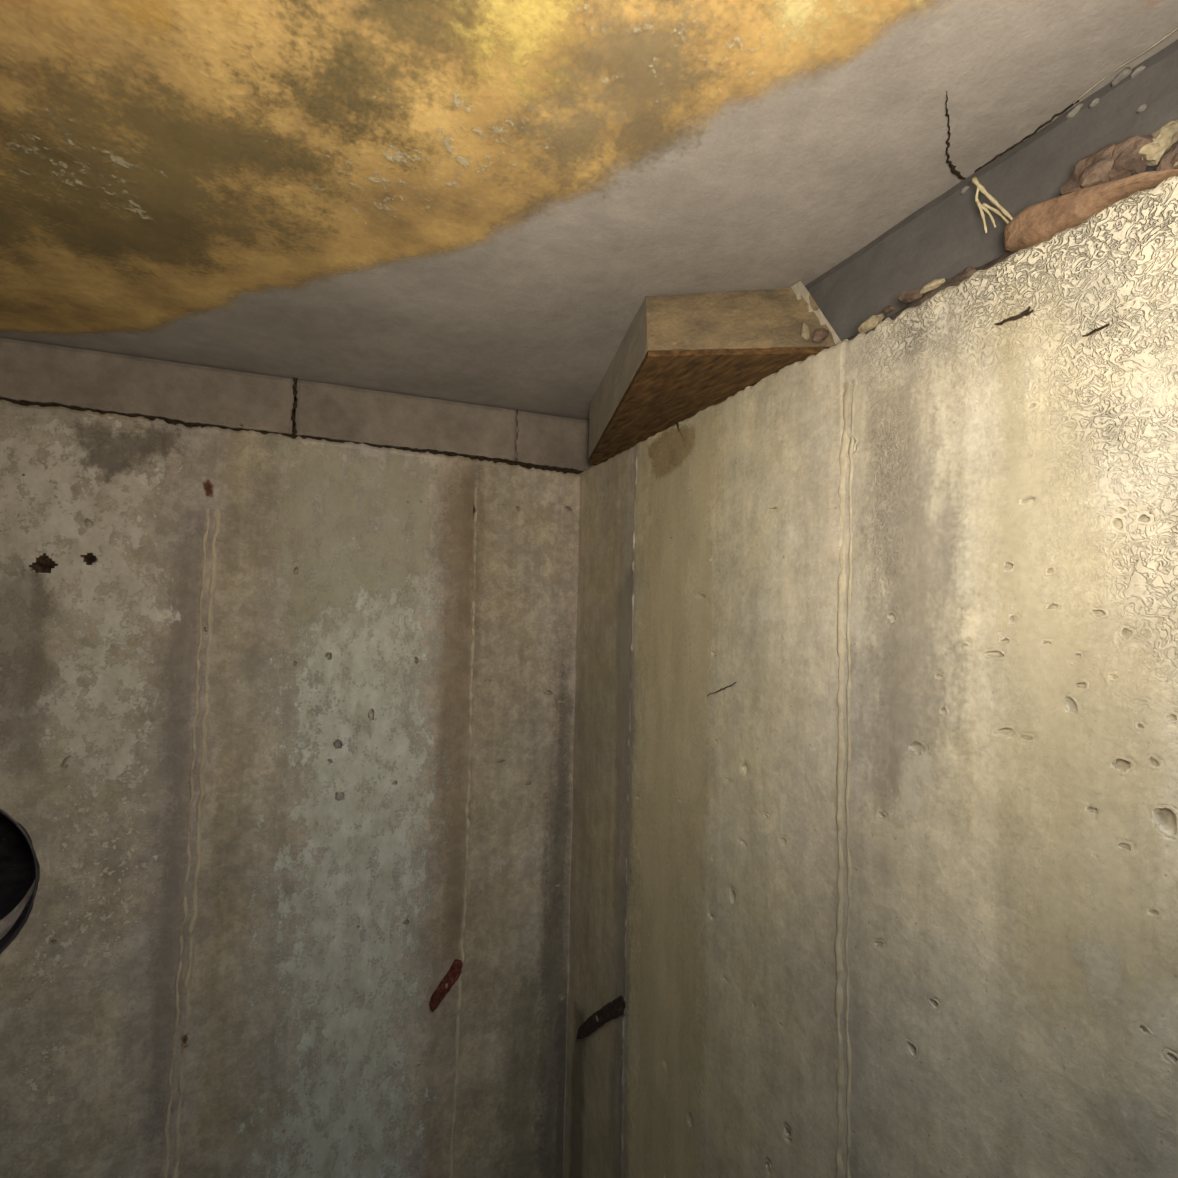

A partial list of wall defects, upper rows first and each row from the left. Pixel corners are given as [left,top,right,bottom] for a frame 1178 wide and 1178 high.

damp [0,0,927,334]
crack [945,92,1079,180]
crack [0,377,578,474]
rust [429,959,463,1012]
rust [576,996,625,1039]